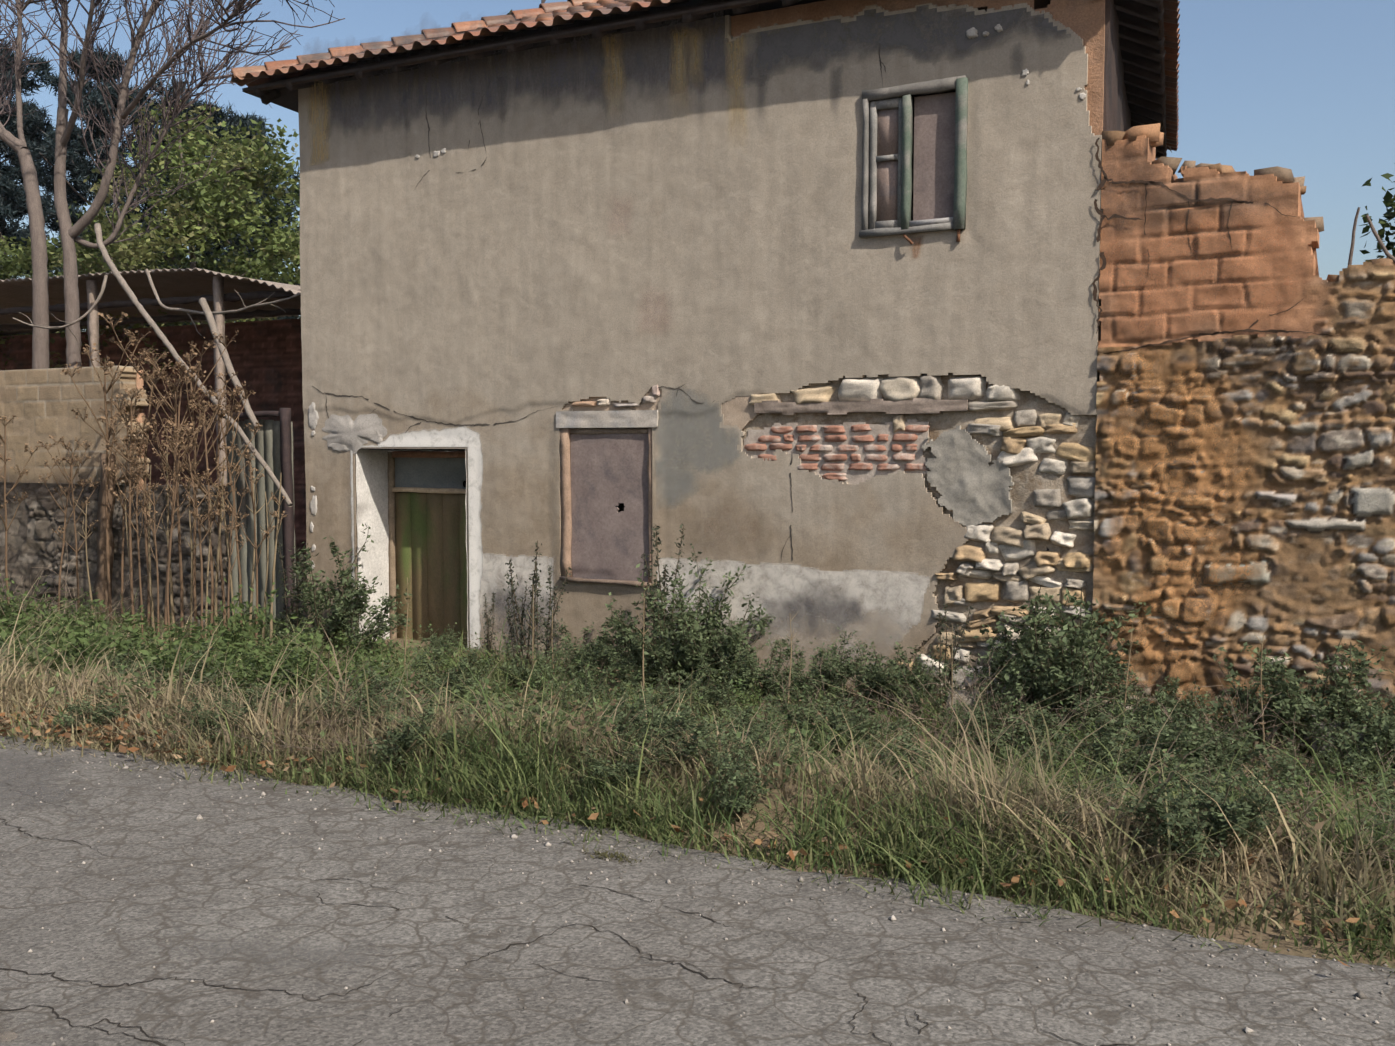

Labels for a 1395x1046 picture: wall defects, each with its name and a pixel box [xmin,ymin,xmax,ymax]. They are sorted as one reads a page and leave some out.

leakage [313,0,1066,127]
spalling [731,0,1105,135]
crack [1092,137,1340,354]
crack [312,386,556,433]
spalling [722,373,1098,709]